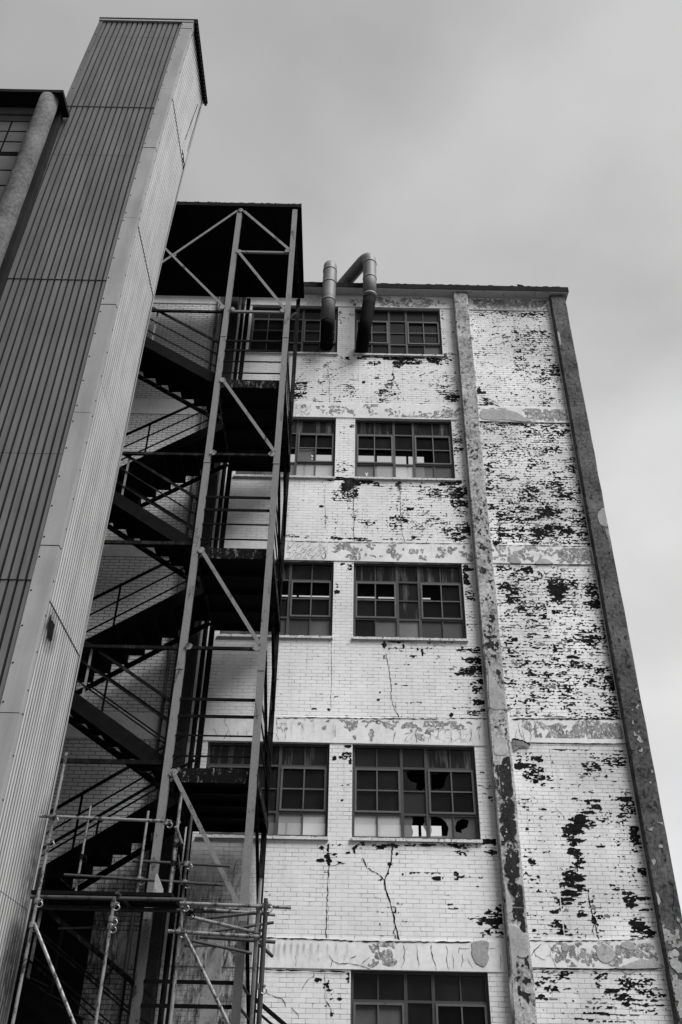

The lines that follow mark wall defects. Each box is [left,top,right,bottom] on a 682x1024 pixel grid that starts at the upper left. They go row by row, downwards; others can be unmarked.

crack [275,640,626,744]
peeling [278,297,682,1023]
crack [265,843,501,1015]